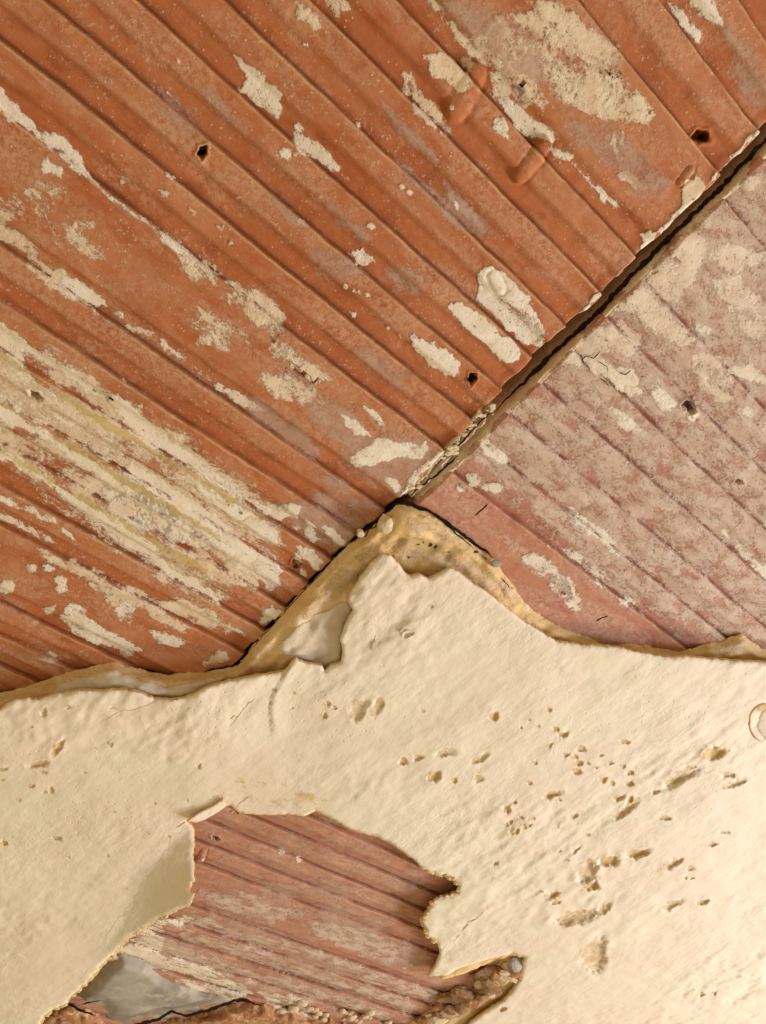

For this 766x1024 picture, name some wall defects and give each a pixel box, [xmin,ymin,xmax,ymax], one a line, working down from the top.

peeling [352,248,375,266]
peeling [59,274,124,318]
peeling [159,338,263,412]
crack [204,137,766,672]
peeling [285,503,347,577]
peeling [278,542,379,670]
peeling [52,668,225,698]
hole [563,746,640,818]
spalling [41,798,462,1024]
crack [68,1000,101,1016]
crack [135,998,262,1024]
spalling [414,953,525,1024]